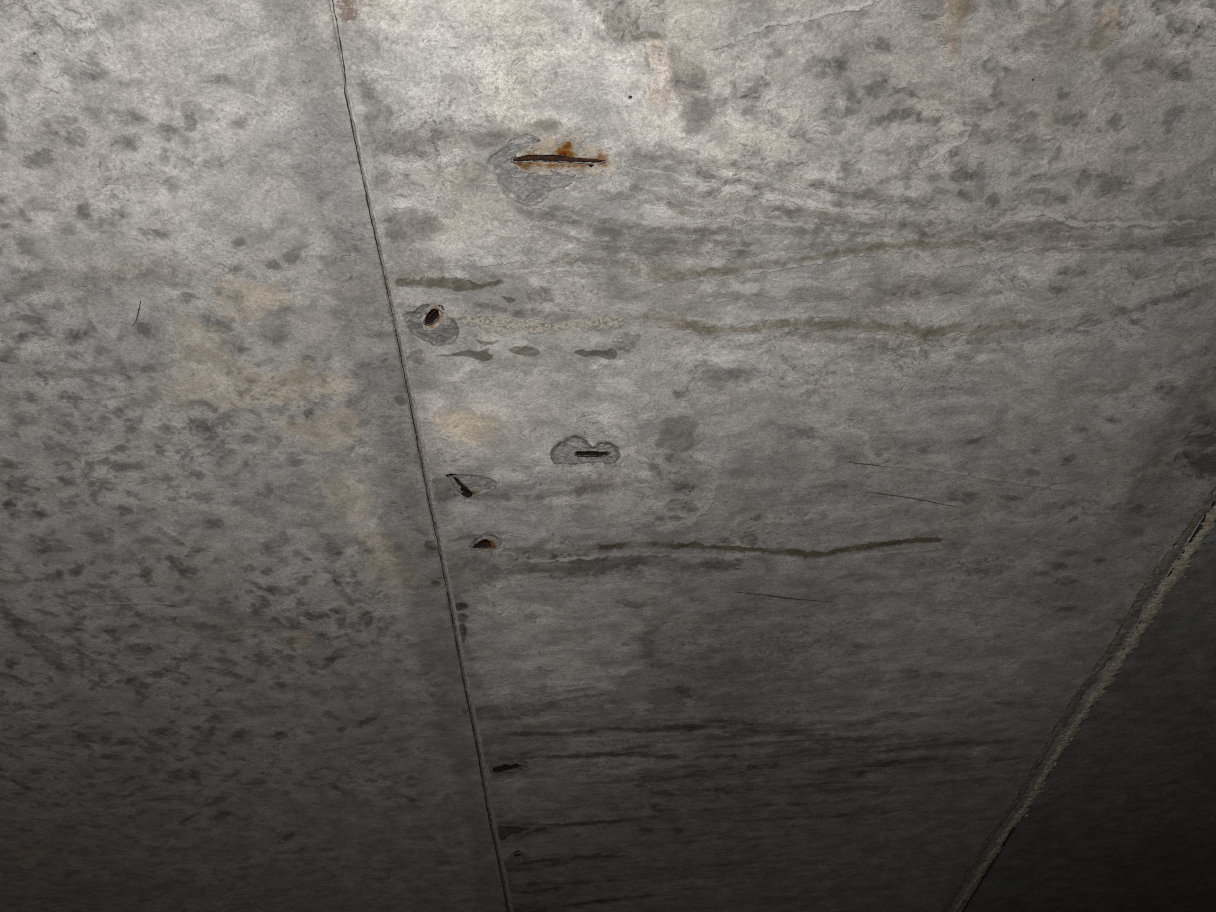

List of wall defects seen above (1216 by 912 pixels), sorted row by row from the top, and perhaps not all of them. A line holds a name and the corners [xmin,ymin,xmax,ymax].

leakage [20,23,112,84]
leakage [195,72,234,85]
leakage [0,90,229,241]
leakage [225,115,249,135]
leakage [0,235,950,703]
leakage [46,714,252,803]